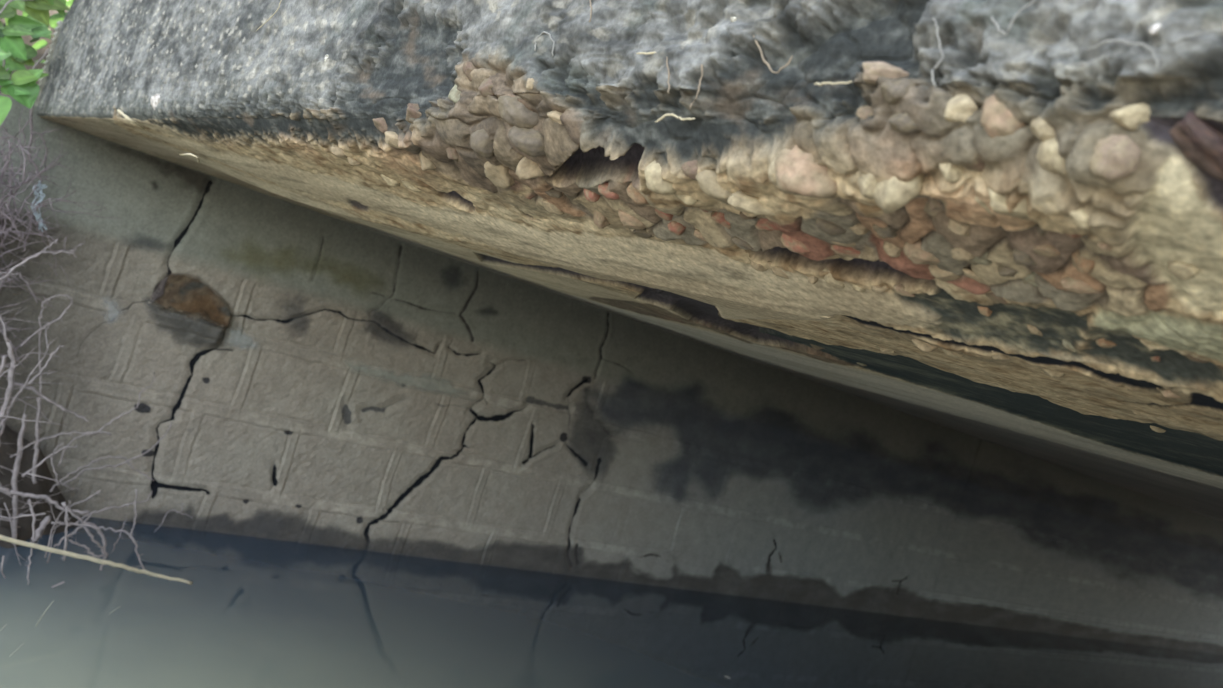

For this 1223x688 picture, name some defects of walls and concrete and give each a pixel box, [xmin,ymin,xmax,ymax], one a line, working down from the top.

crack [166,180,213,276]
crack [150,245,631,548]
spalling [112,53,1223,441]
damp [585,381,1223,596]